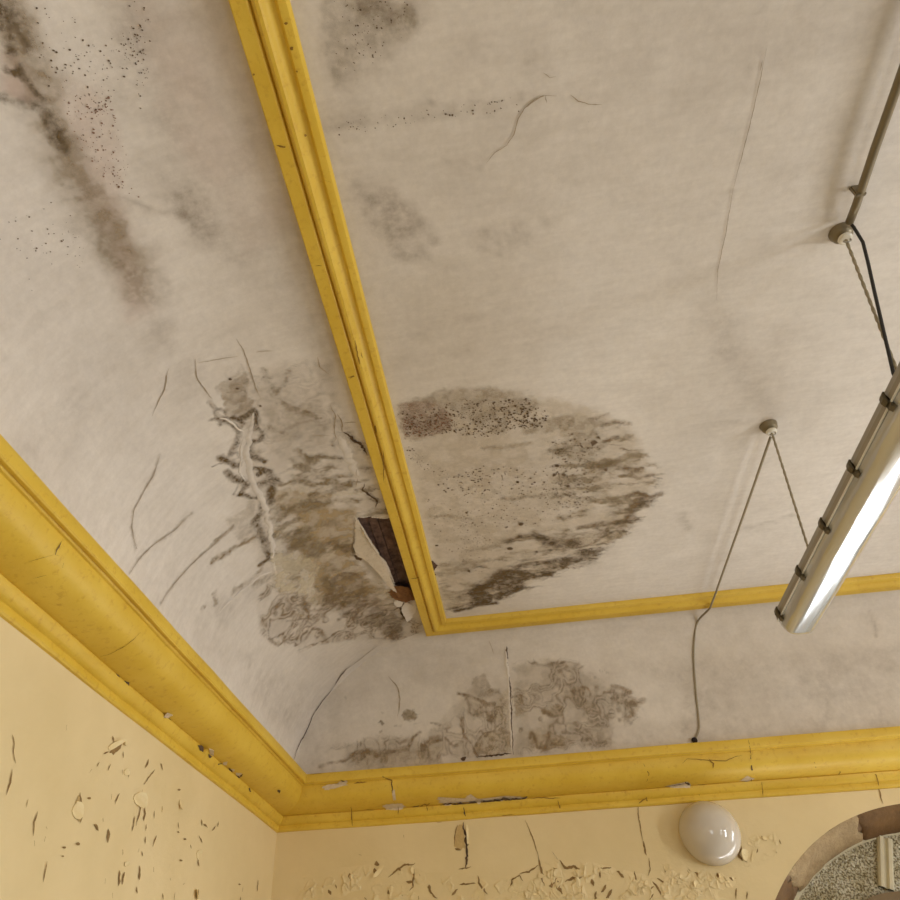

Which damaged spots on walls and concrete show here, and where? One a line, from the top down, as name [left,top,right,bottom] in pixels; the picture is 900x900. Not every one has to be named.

damp [0,0,151,200]
damp [402,398,547,438]
crack [130,460,192,573]
damp [262,450,398,646]
flaking render [353,516,416,622]
damp [406,433,655,612]
crack [461,642,514,761]
peeling [112,759,163,898]
crack [381,769,560,875]
peeling [295,831,781,900]
crack [638,797,651,875]
flaking render [858,804,900,840]